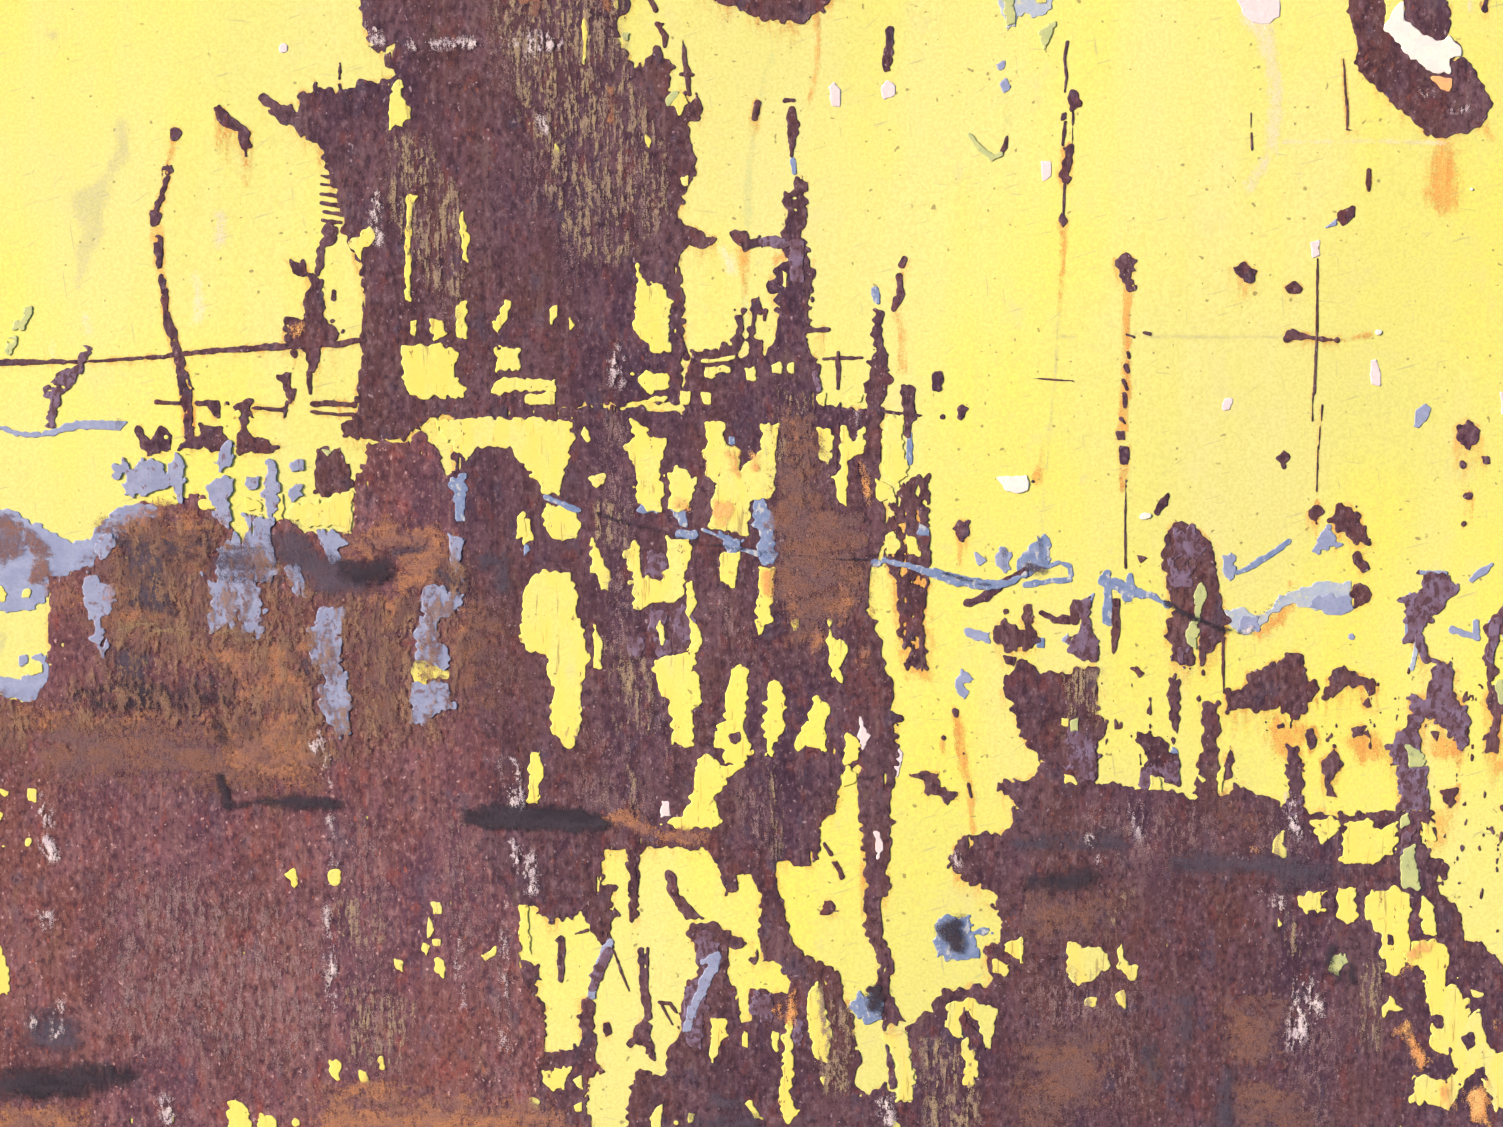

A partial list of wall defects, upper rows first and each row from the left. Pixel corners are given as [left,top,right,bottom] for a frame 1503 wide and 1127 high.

corrosion [696,0,844,101]
corrosion [1343,0,1495,215]
corrosion [148,125,229,457]
peeling [0,418,128,438]
corrosion [134,425,173,460]
corrosion [225,347,326,462]
peeling [0,653,49,702]
peeling [0,452,186,659]
peeling [200,440,353,740]
corrosion [884,563,937,683]
corrosion [1160,520,1232,733]
corrosion [1305,498,1376,612]